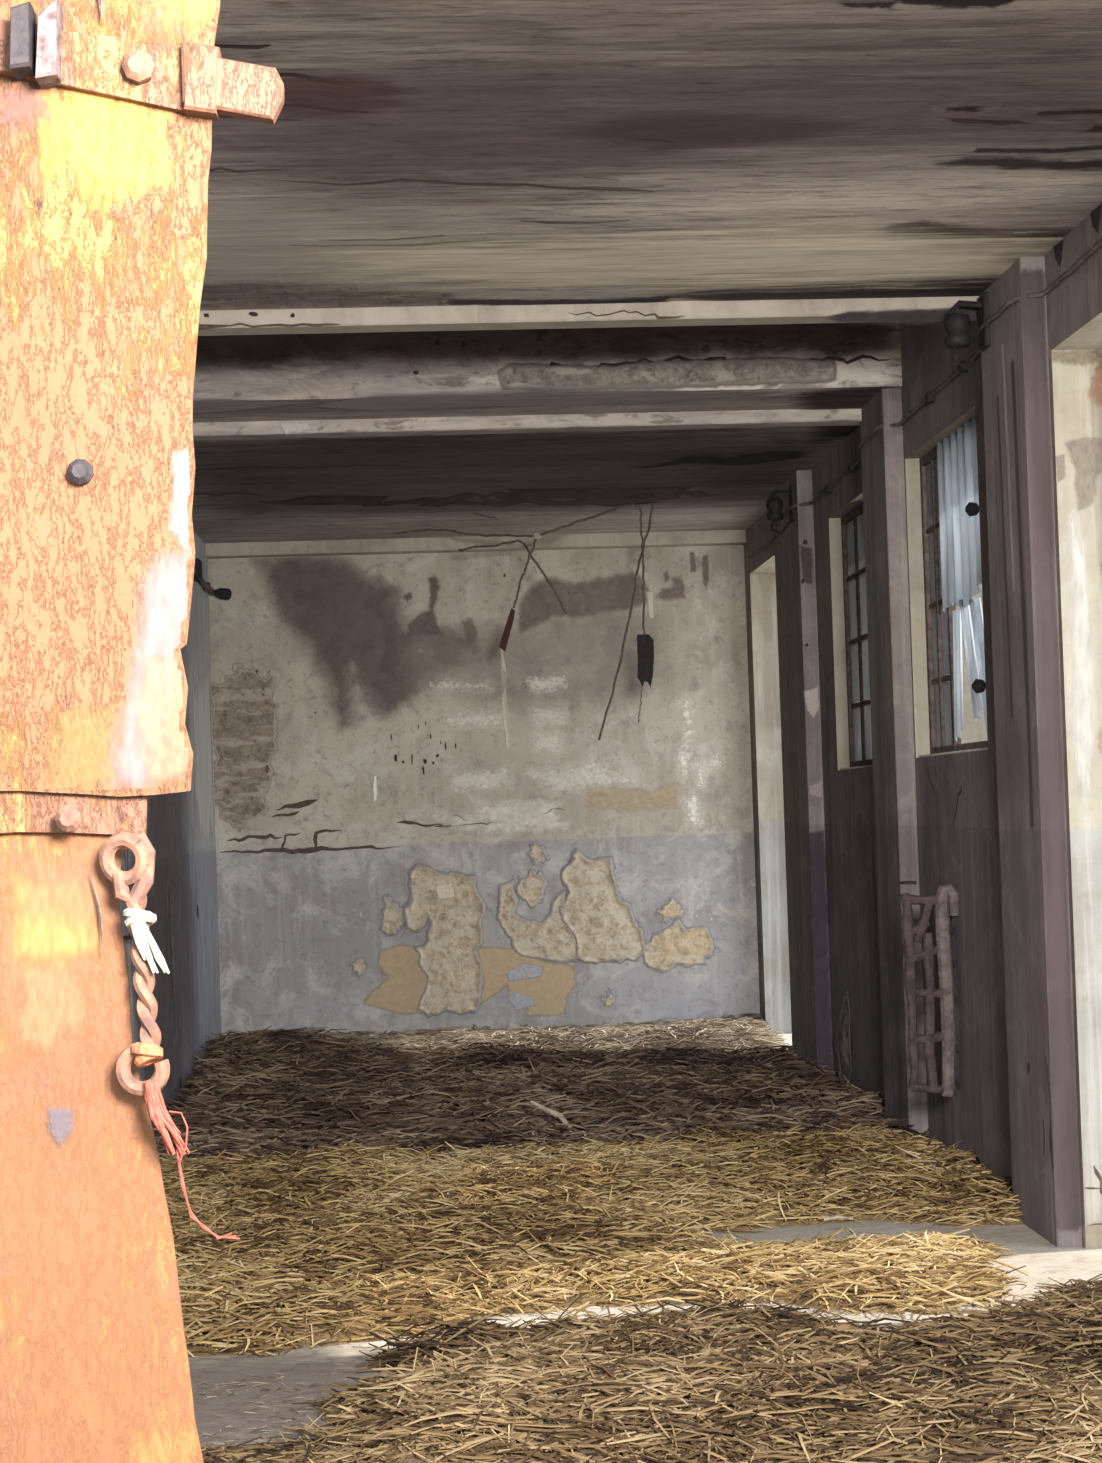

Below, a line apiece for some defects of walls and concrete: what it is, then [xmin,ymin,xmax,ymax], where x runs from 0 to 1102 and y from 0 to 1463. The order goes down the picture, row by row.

water stain [839,0,1013,8]
water stain [520,552,709,630]
water stain [270,558,485,720]
crack [220,799,498,854]
flaking render [349,842,715,1017]